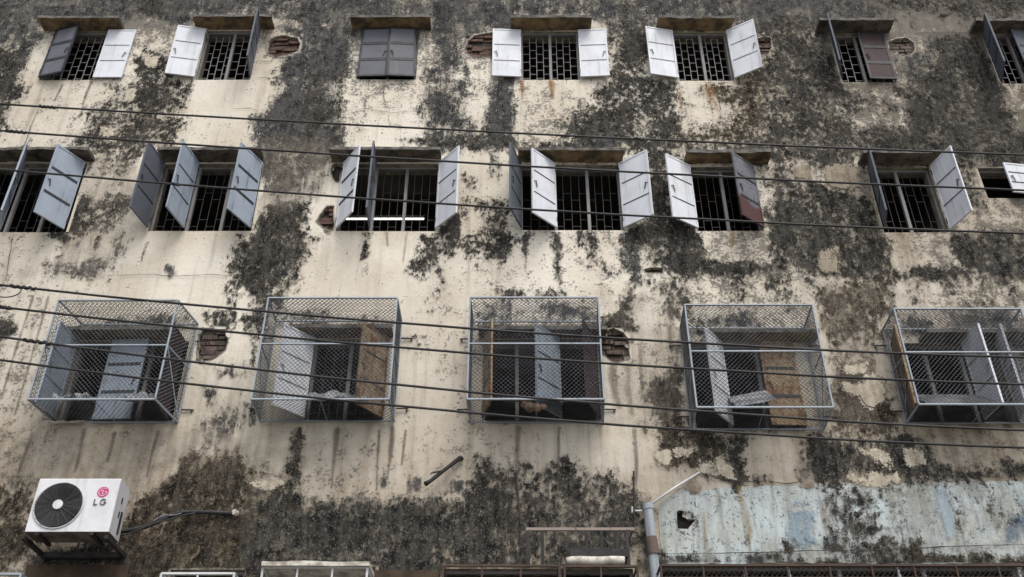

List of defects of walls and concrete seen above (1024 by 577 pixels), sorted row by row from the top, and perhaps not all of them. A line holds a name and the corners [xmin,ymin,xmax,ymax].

spalling [263,33,304,59]
spalling [463,32,493,59]
spalling [757,32,773,55]
spalling [887,37,917,56]
damp [0,0,1024,367]
spalling [315,205,335,234]
spalling [195,324,229,362]
spalling [601,327,634,363]
damp [0,388,655,577]
spalling [675,509,697,536]